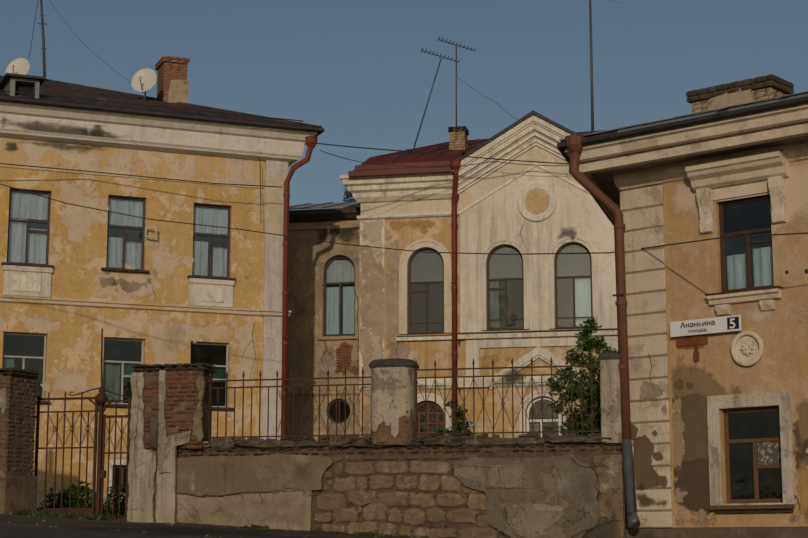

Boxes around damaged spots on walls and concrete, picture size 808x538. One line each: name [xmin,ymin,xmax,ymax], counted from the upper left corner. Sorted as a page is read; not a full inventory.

damp [17,121,116,151]
peeling [55,176,109,246]
peeling [91,232,194,302]
peeling [18,312,61,333]
flaking render [318,220,416,444]
flaking render [0,388,9,417]
peeling [40,368,101,394]
flaking render [97,310,260,524]
spalling [631,375,688,506]
spalling [313,452,506,538]